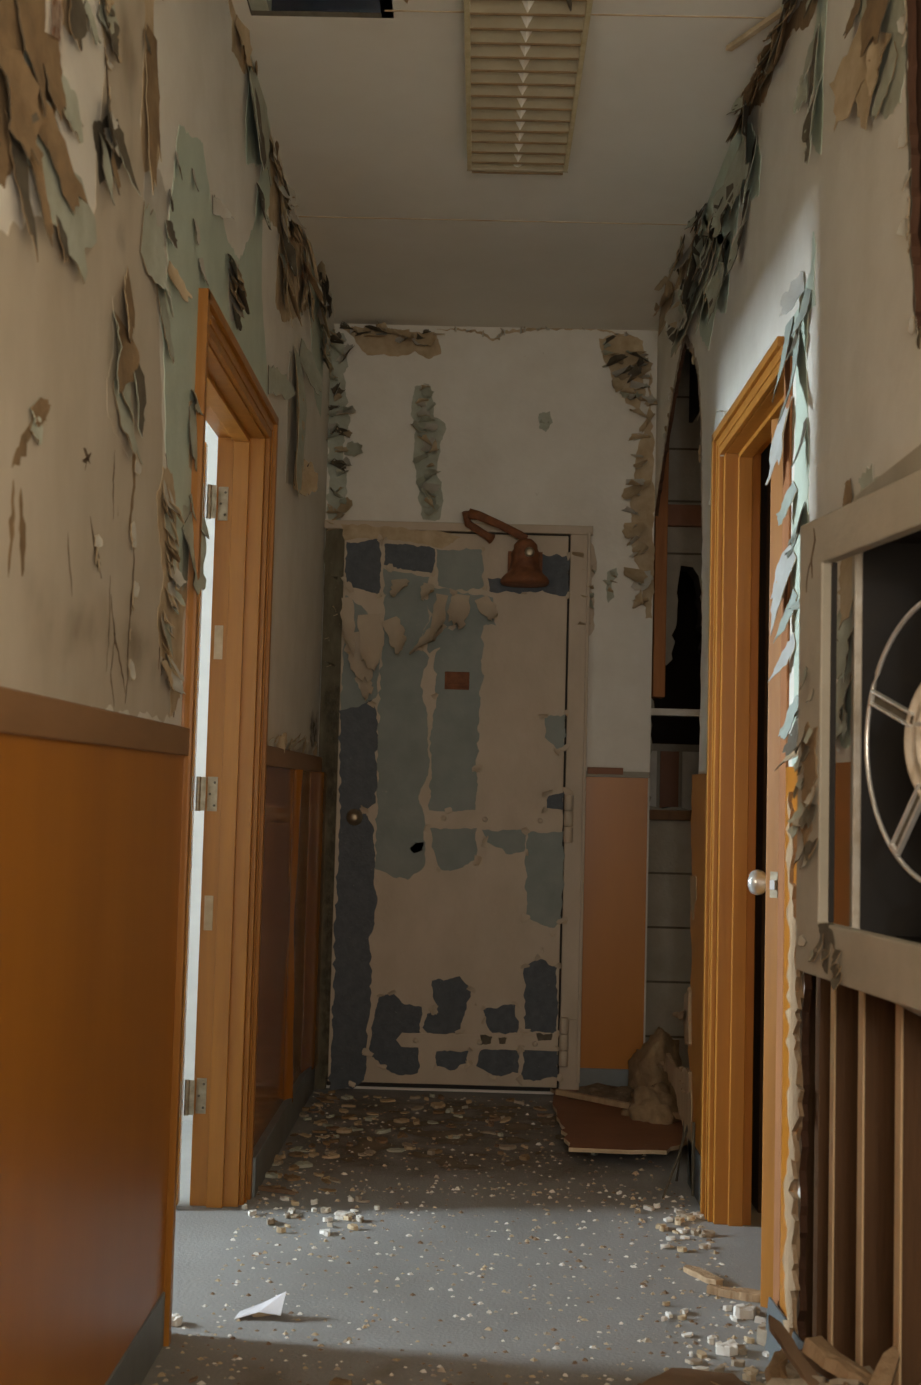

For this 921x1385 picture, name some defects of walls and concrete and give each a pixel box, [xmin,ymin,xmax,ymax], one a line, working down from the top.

peeling [0,0,906,1090]